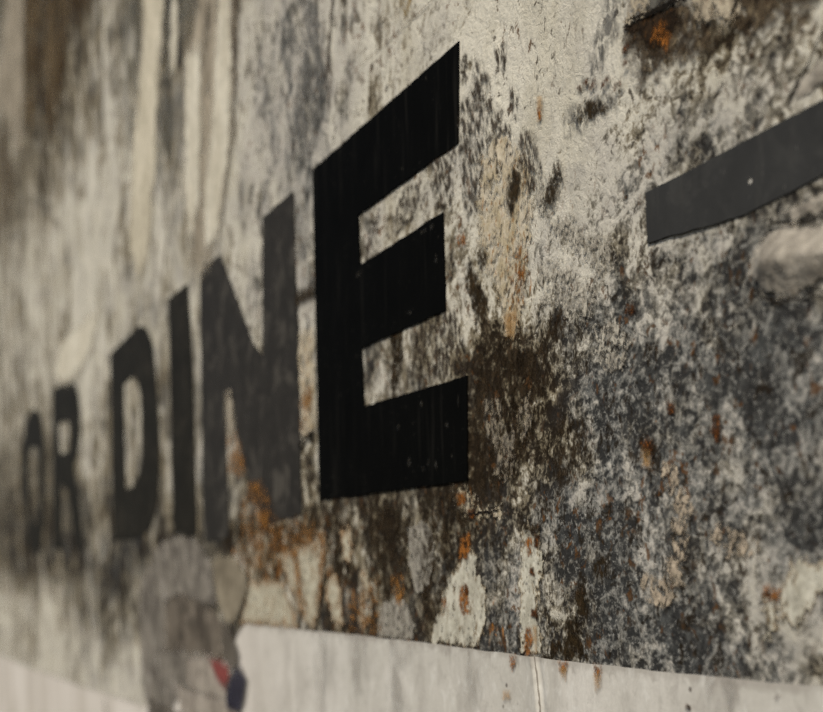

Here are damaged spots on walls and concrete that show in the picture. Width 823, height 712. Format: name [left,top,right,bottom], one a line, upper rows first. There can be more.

leakage [24,0,94,133]
rust [577,76,621,92]
leakage [465,256,488,321]
rust [224,389,245,478]
leakage [389,307,573,500]
leakage [550,418,592,483]
leakage [593,550,607,585]
leakage [544,585,588,661]
crack [533,651,541,712]